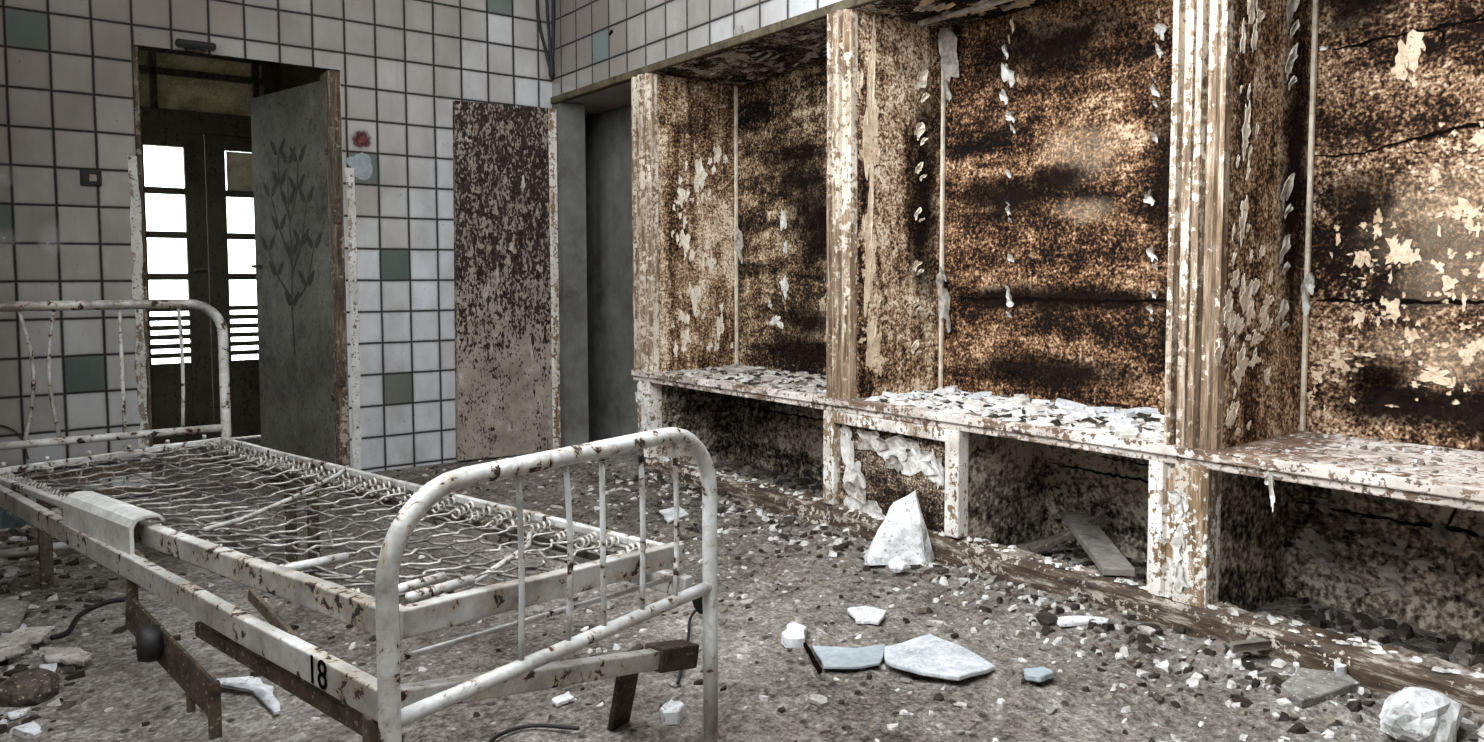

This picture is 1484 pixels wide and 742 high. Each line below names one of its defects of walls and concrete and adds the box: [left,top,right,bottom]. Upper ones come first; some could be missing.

peeling [913,0,1035,133]
damp [975,8,1130,78]
flaking render [1391,29,1426,87]
peeling [671,146,733,357]
peeling [856,14,889,376]
damp [966,167,1083,219]
damp [978,355,1139,388]
damp [961,283,1167,352]
damp [1152,84,1172,244]
peeling [1215,83,1315,436]
peeling [1307,197,1484,412]
crack [1314,123,1484,158]